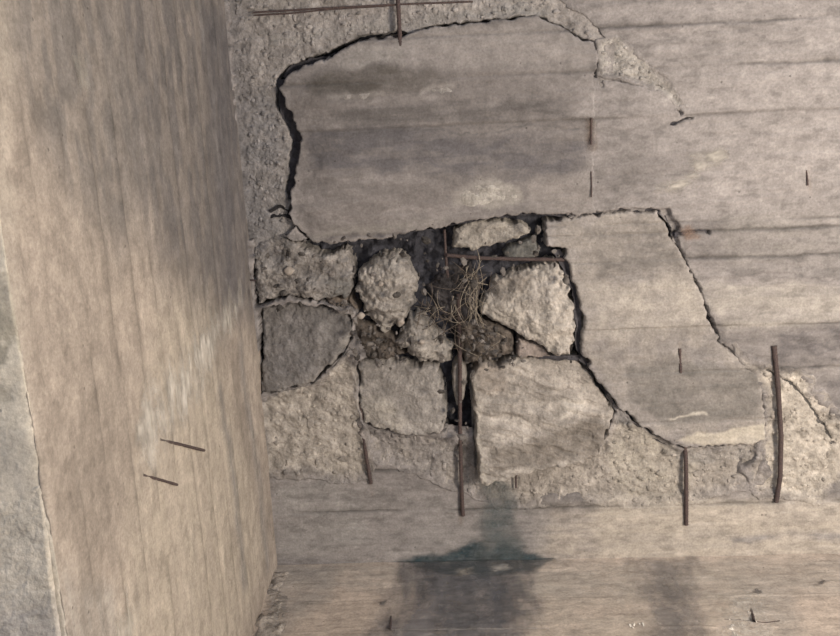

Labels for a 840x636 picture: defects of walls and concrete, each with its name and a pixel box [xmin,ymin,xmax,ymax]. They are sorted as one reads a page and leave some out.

crack [268,34,407,220]
peeling [228,0,840,512]
crack [410,208,707,251]
crack [539,249,665,444]
crack [766,369,834,444]
damp [388,485,553,636]